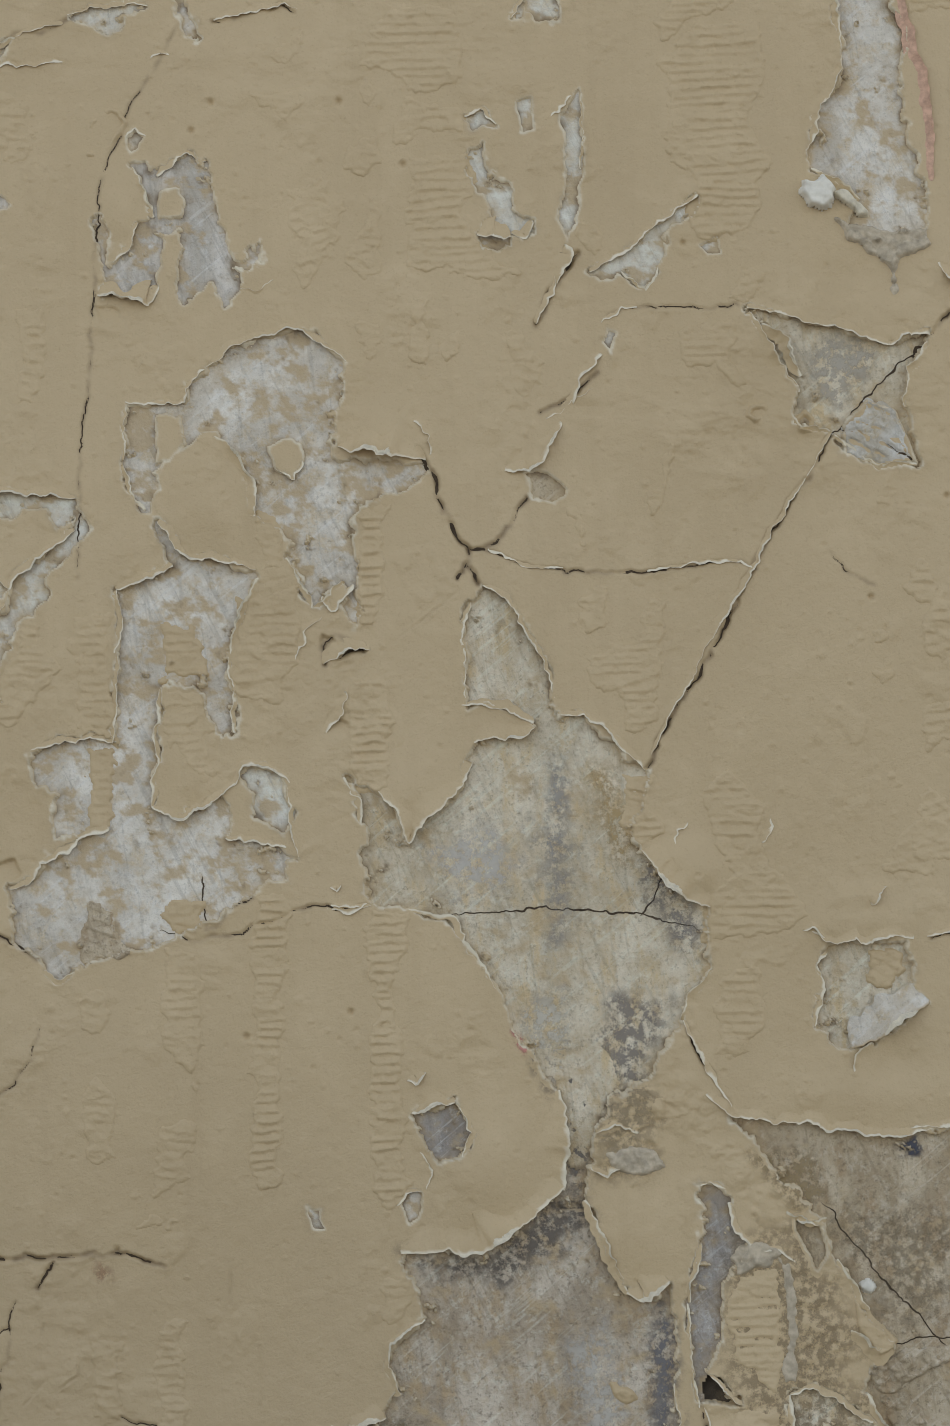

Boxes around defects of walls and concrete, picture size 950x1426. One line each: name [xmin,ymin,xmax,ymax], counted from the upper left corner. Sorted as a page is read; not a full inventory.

peeling [67,0,147,35]
peeling [92,126,273,308]
crack [534,244,577,324]
crack [540,303,734,419]
peeling [746,303,930,470]
peeling [798,0,931,295]
crack [938,261,950,278]
crack [421,459,585,582]
crack [625,312,950,768]
peeling [0,323,435,985]
peeling [327,585,950,1426]
crack [0,1303,16,1335]